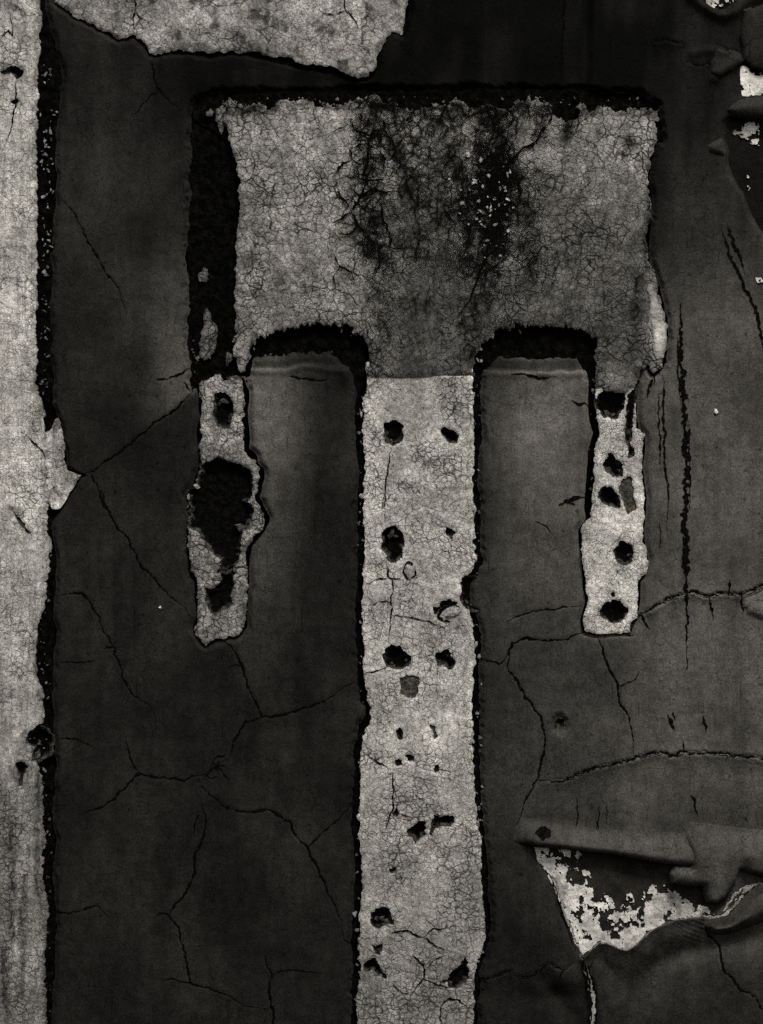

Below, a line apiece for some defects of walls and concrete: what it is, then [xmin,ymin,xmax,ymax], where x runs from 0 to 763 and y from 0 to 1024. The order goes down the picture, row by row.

spalling [0,66,24,79]
peeling [647,281,668,359]
crack [61,591,157,728]
crack [87,366,195,614]
peeling [15,0,408,1024]
crack [86,640,386,1024]
spalling [183,88,662,1024]
crack [480,605,763,846]
peeling [534,826,754,955]
crack [639,581,763,628]